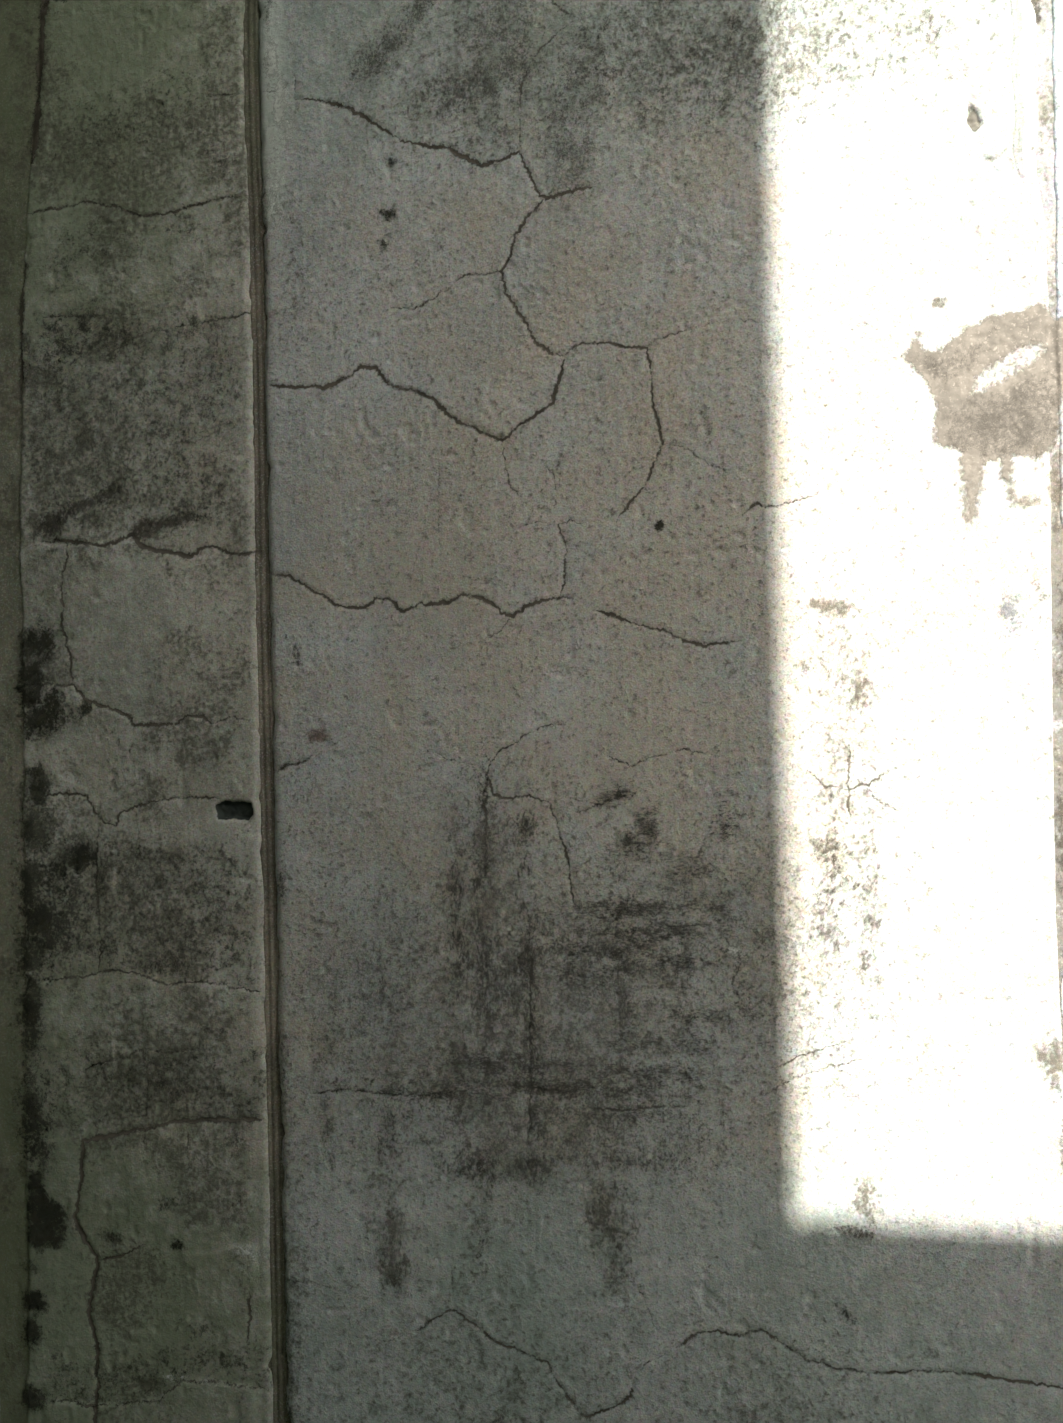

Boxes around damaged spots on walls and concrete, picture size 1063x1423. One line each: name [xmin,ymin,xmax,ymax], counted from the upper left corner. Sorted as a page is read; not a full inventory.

crack [17,0,755,761]
damp [901,303,1063,529]
mould [14,614,97,741]
crack [42,792,260,992]
crack [280,743,335,770]
crack [481,724,600,903]
crack [609,748,703,795]
damp [9,761,266,1350]
damp [292,756,874,1298]
crack [44,1048,263,1423]
damp [18,1319,272,1412]
crack [383,1272,1063,1419]